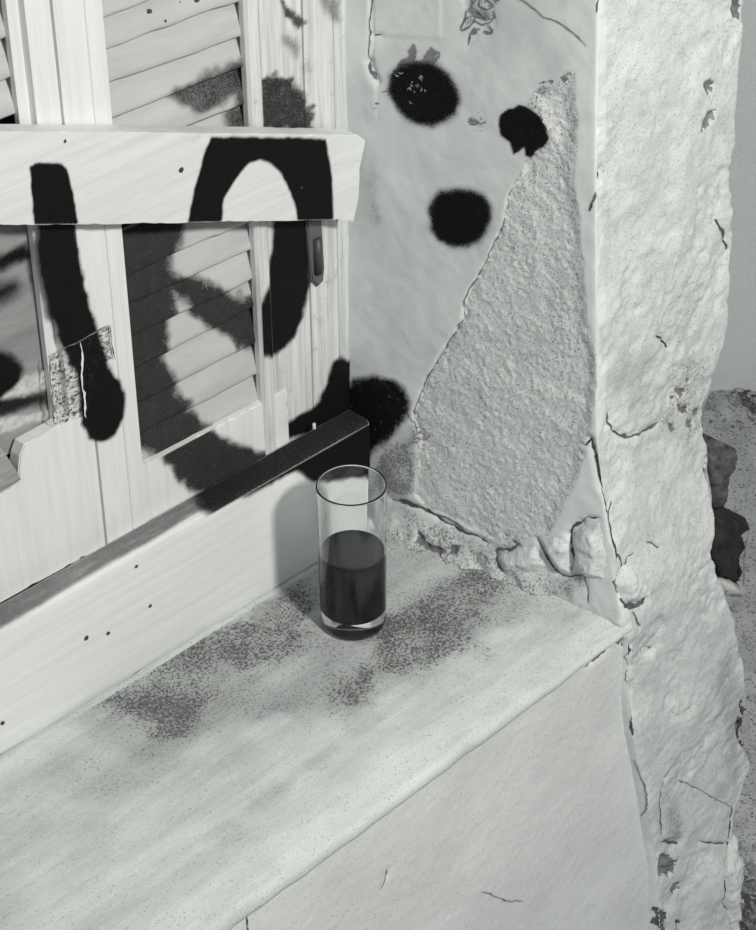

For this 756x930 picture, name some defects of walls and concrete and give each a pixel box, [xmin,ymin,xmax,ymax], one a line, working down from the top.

crack [521,0,586,46]
damp [63,421,589,799]
spalling [415,531,460,555]
spalling [414,70,598,545]
crack [393,191,659,686]
crack [633,760,732,846]